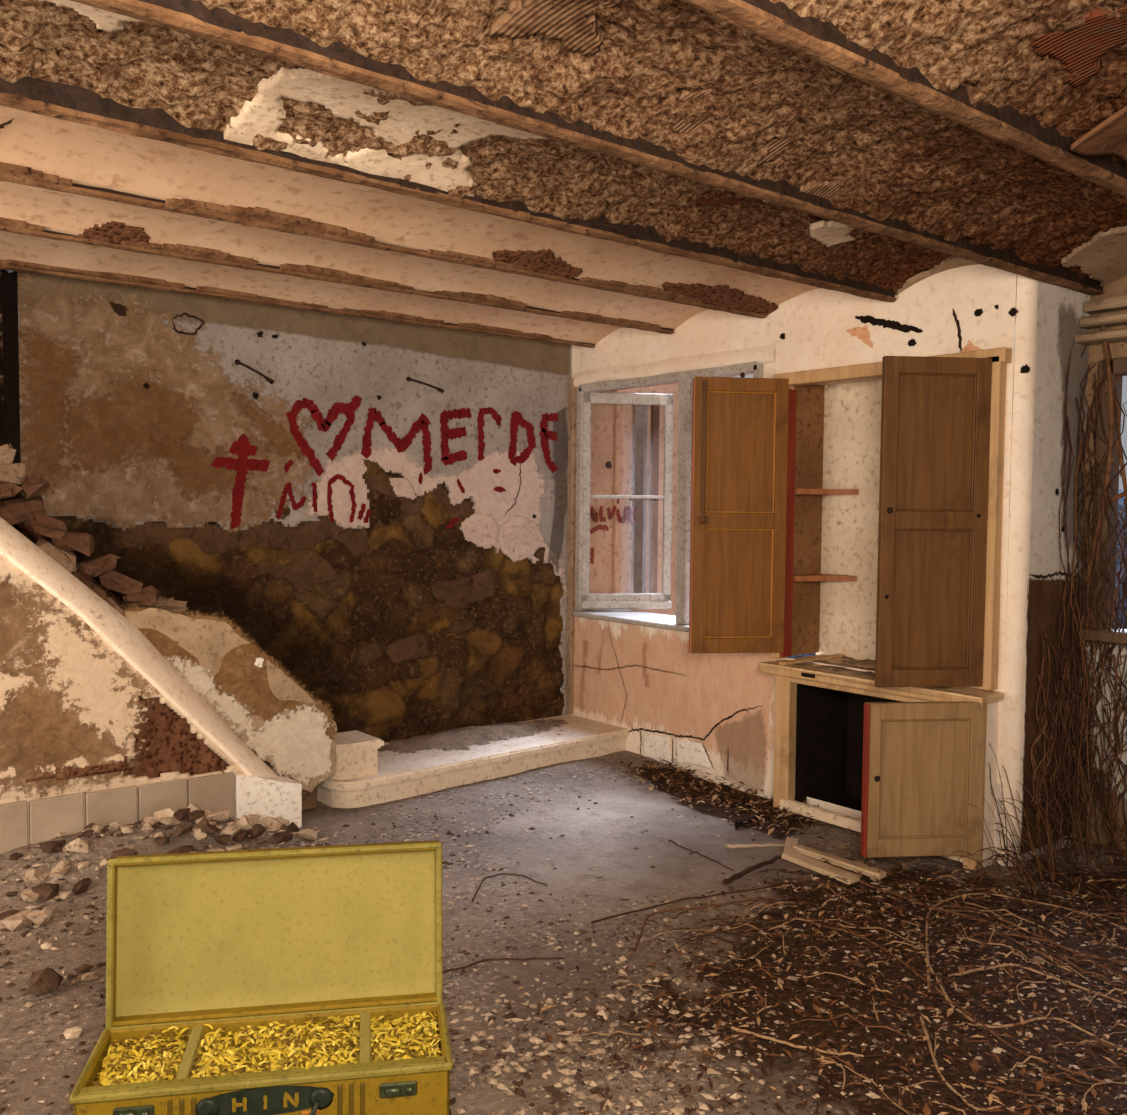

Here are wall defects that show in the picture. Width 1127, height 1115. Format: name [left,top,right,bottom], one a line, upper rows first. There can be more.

flaking render [38,0,145,33]
flaking render [224,67,549,196]
flaking render [0,162,72,187]
flaking render [78,221,258,265]
flaking render [165,198,375,243]
flaking render [810,220,856,247]
flaking render [427,249,779,316]
flaking render [561,310,661,329]
spalling [17,521,129,610]
flaking render [48,447,567,743]
peeling [0,596,230,782]
crack [575,626,763,771]